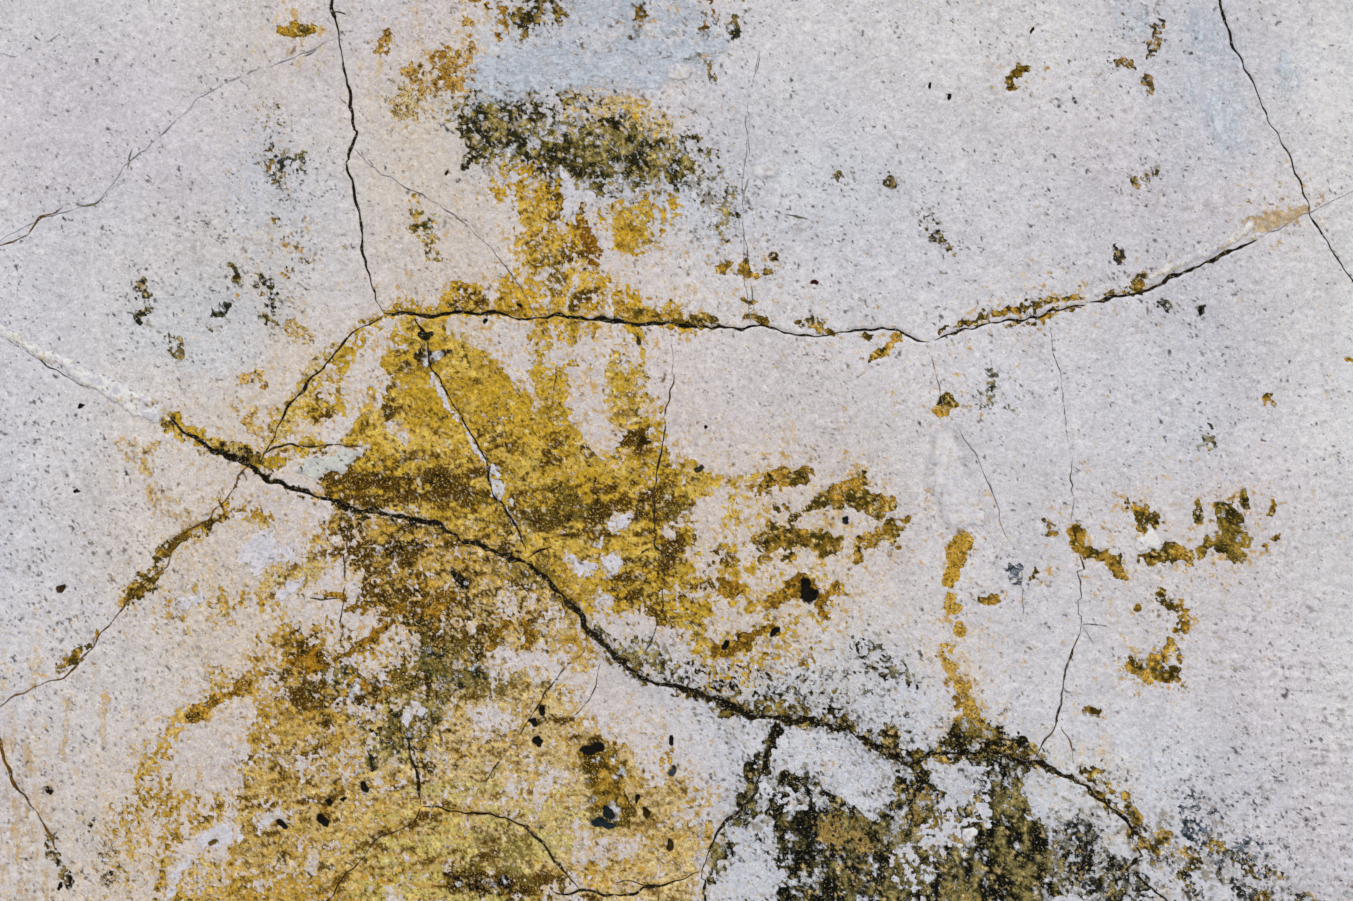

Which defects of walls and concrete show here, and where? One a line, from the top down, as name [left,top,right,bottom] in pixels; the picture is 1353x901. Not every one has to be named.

crack [1,68,260,245]
crack [270,39,332,67]
crack [329,0,467,309]
water stain [442,0,751,267]
crack [742,104,750,211]
crack [1091,221,1290,303]
crack [1219,0,1353,281]
crack [0,222,1168,901]
water stain [592,571,1317,901]